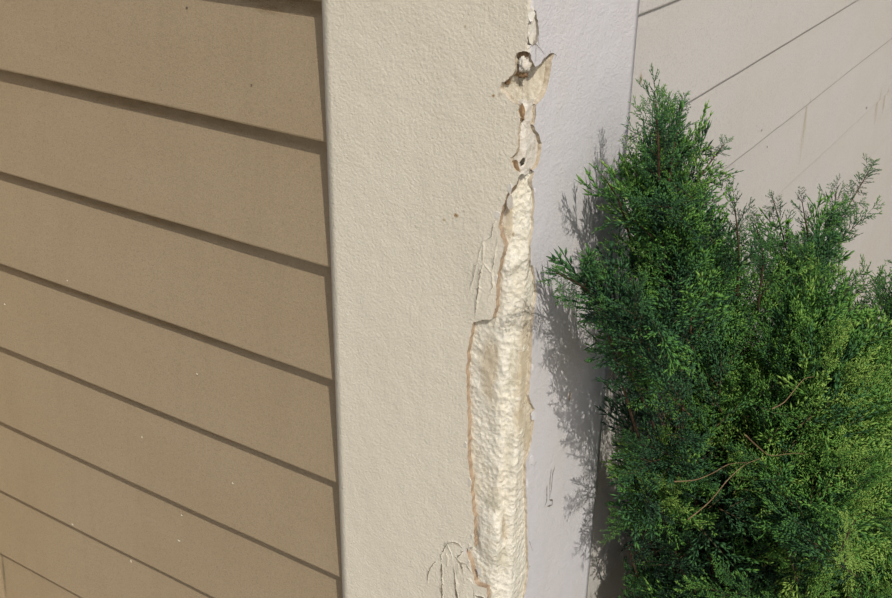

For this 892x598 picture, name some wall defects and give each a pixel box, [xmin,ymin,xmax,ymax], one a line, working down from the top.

crack [467,220,499,318]
spalling [462,7,555,598]
crack [426,539,485,598]